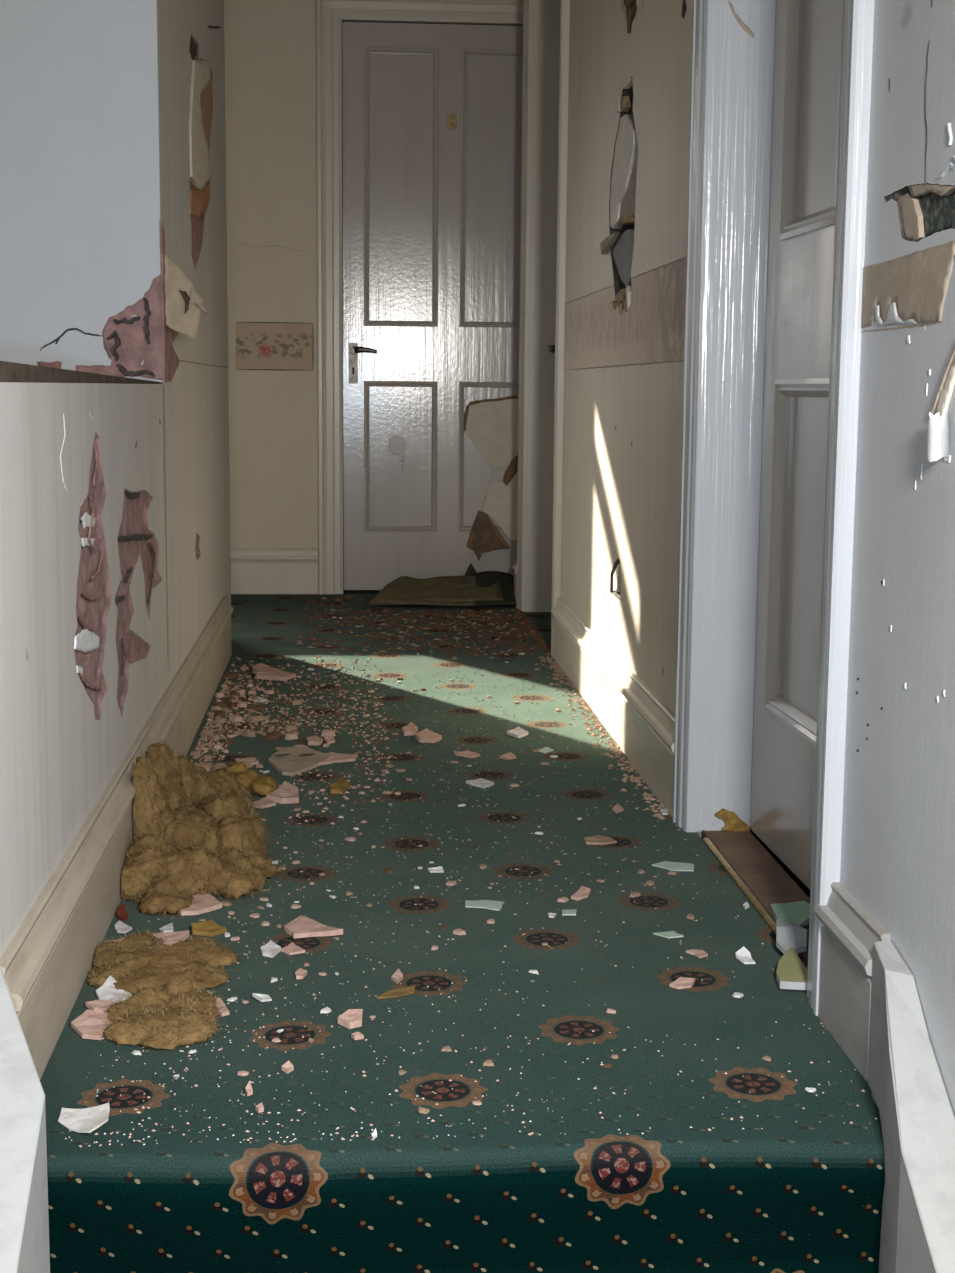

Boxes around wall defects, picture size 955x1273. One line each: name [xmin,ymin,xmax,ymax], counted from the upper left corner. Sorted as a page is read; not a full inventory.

flaking render [37,219,180,383]
spalling [600,78,638,314]
spalling [621,0,638,33]
peeling [861,123,955,344]
crack [923,40,931,184]
flaking render [73,432,162,721]